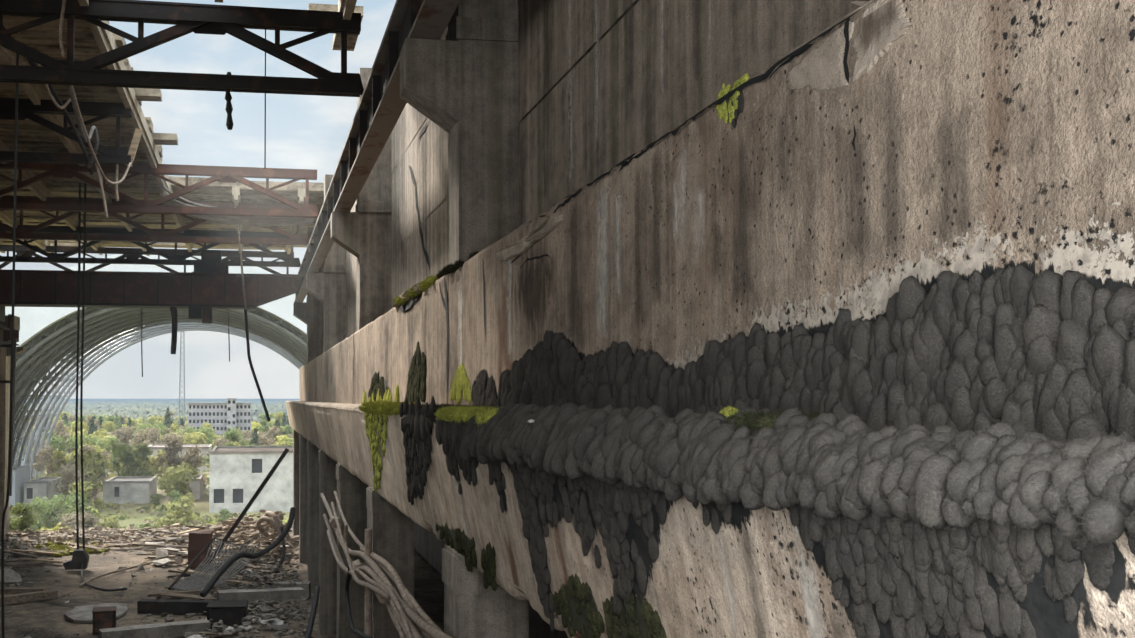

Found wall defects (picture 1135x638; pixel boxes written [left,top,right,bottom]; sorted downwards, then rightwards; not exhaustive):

flaking render [765,0,914,92]
crack [517,11,858,229]
damp [666,180,1135,370]
damp [687,568,732,634]
damp [772,509,841,638]
damp [1125,574,1135,593]